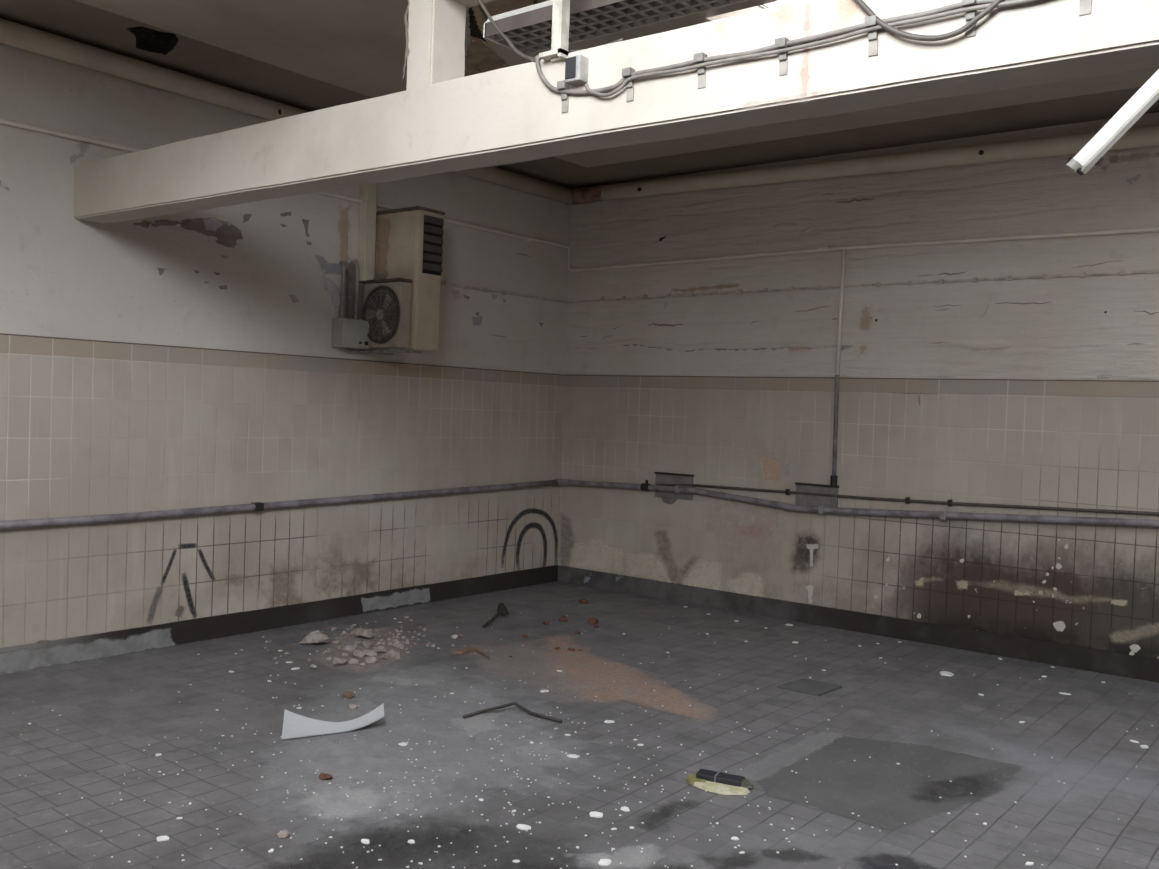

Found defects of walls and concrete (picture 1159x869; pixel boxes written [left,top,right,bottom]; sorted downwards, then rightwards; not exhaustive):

peeling [134,214,251,257]
peeling [280,212,341,307]